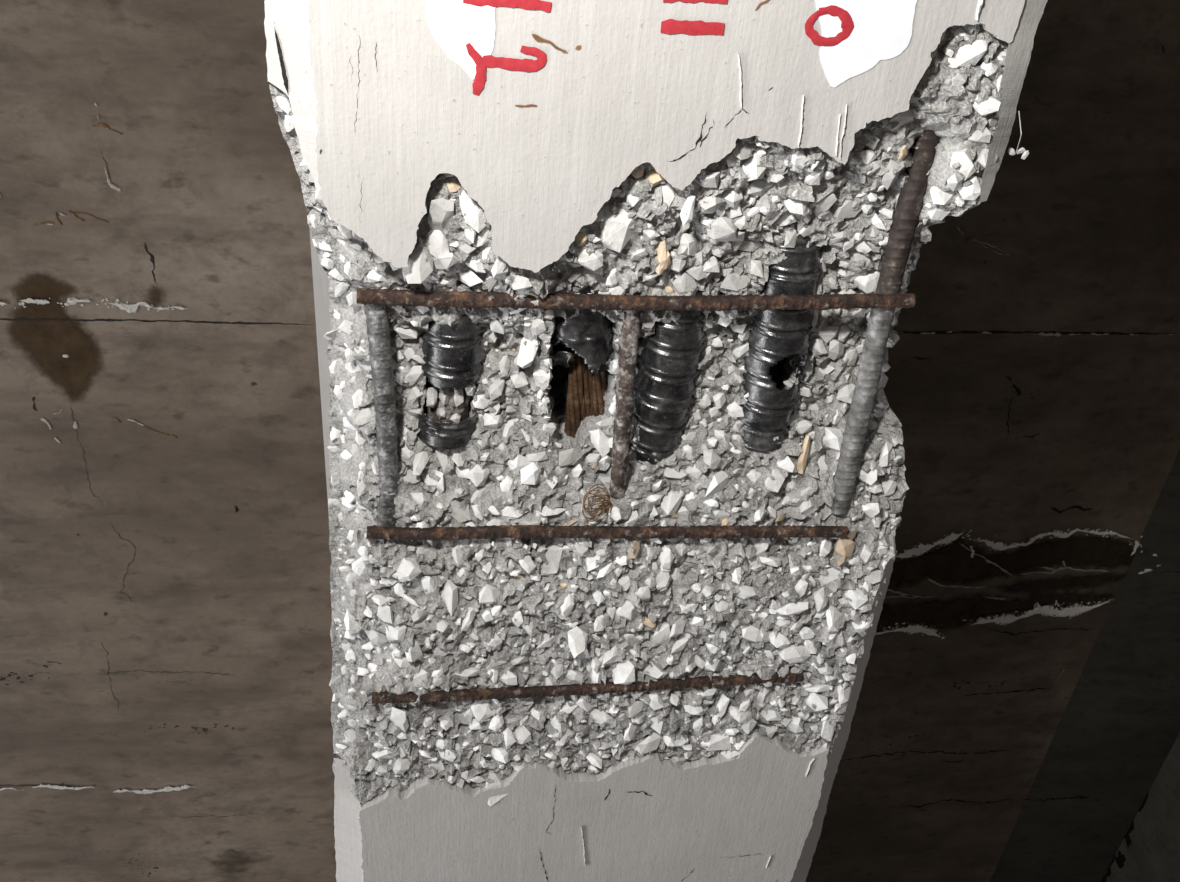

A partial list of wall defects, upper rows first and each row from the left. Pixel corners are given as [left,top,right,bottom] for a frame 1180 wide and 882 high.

peeling [426,0,495,80]
peeling [815,0,917,88]
damp [0,274,187,400]
spalling [267,23,1029,806]
crack [538,787,556,880]